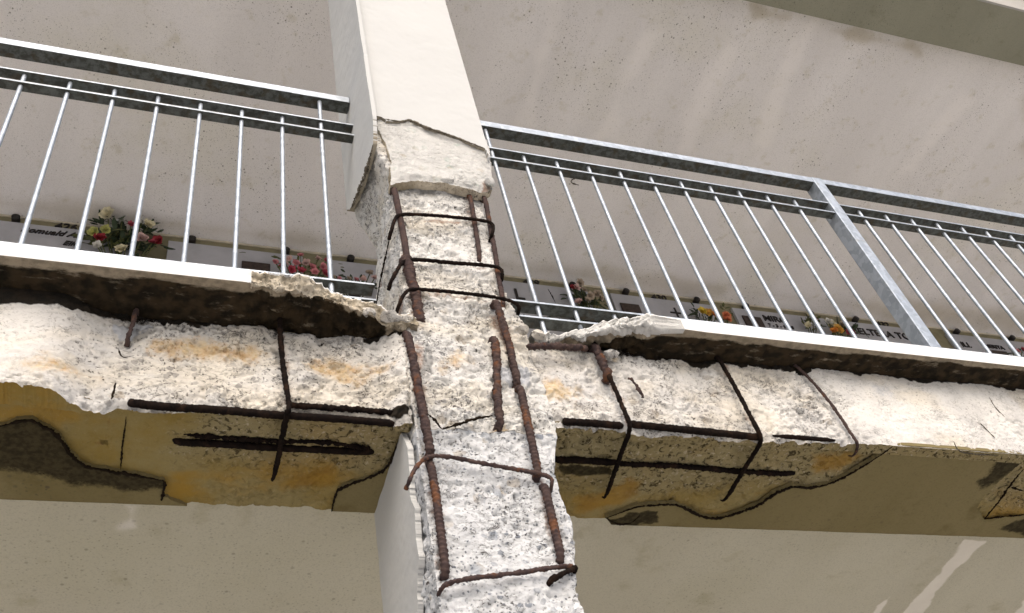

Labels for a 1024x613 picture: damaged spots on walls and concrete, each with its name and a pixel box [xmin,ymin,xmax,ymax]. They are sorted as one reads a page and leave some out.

rust [376,175,492,301]
water stain [0,404,163,537]
crack [0,383,167,501]
spalling [0,306,430,534]
rust [123,255,524,438]
rust [415,453,458,613]
crack [416,409,493,430]
rust [533,477,573,571]
spalling [355,120,1024,613]
rust [716,362,767,438]